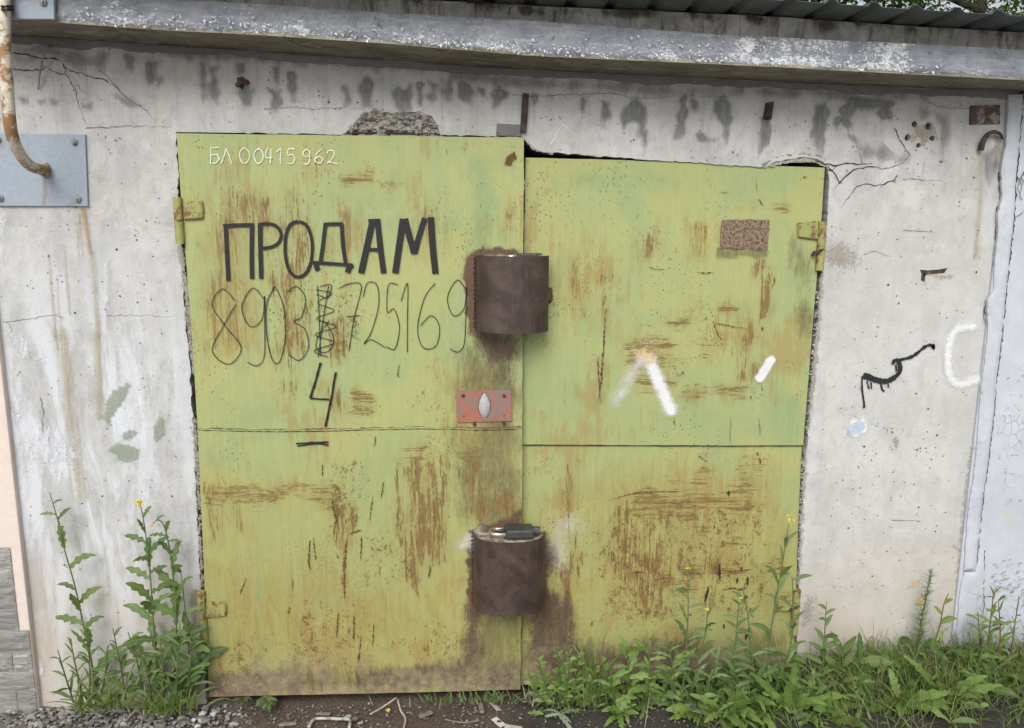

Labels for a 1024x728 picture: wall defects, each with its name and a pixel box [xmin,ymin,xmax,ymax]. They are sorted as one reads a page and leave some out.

crack [13,52,162,128]
water stain [269,61,296,106]
water stain [346,78,373,103]
water stain [392,72,516,109]
spalling [341,100,444,137]
water stain [622,99,646,142]
water stain [676,95,696,134]
water stain [714,96,732,137]
water stain [761,119,771,145]
water stain [811,93,894,145]
crack [826,128,940,205]
rust [719,219,770,250]